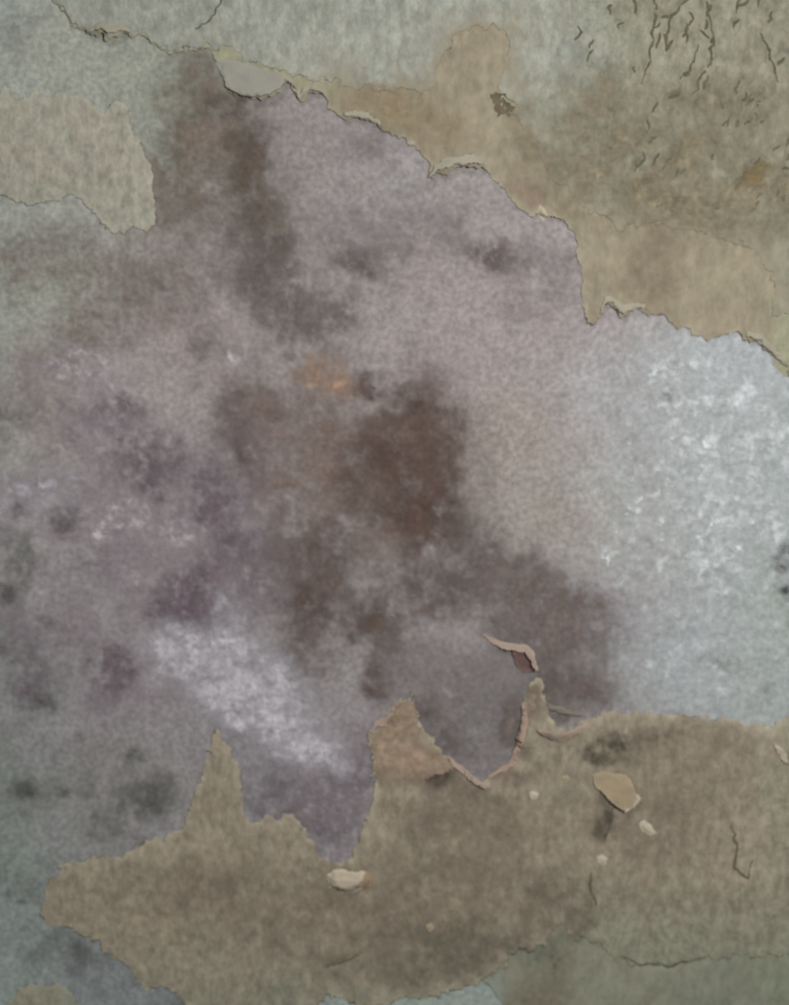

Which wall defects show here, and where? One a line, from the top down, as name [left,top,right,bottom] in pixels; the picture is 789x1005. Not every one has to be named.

damp [152,53,353,336]
peeling [52,0,789,372]
damp [471,243,515,271]
crack [574,25,594,62]
crack [607,0,789,213]
damp [49,297,623,838]
damp [601,336,789,718]
peeling [39,633,789,1005]
crack [622,955,704,968]